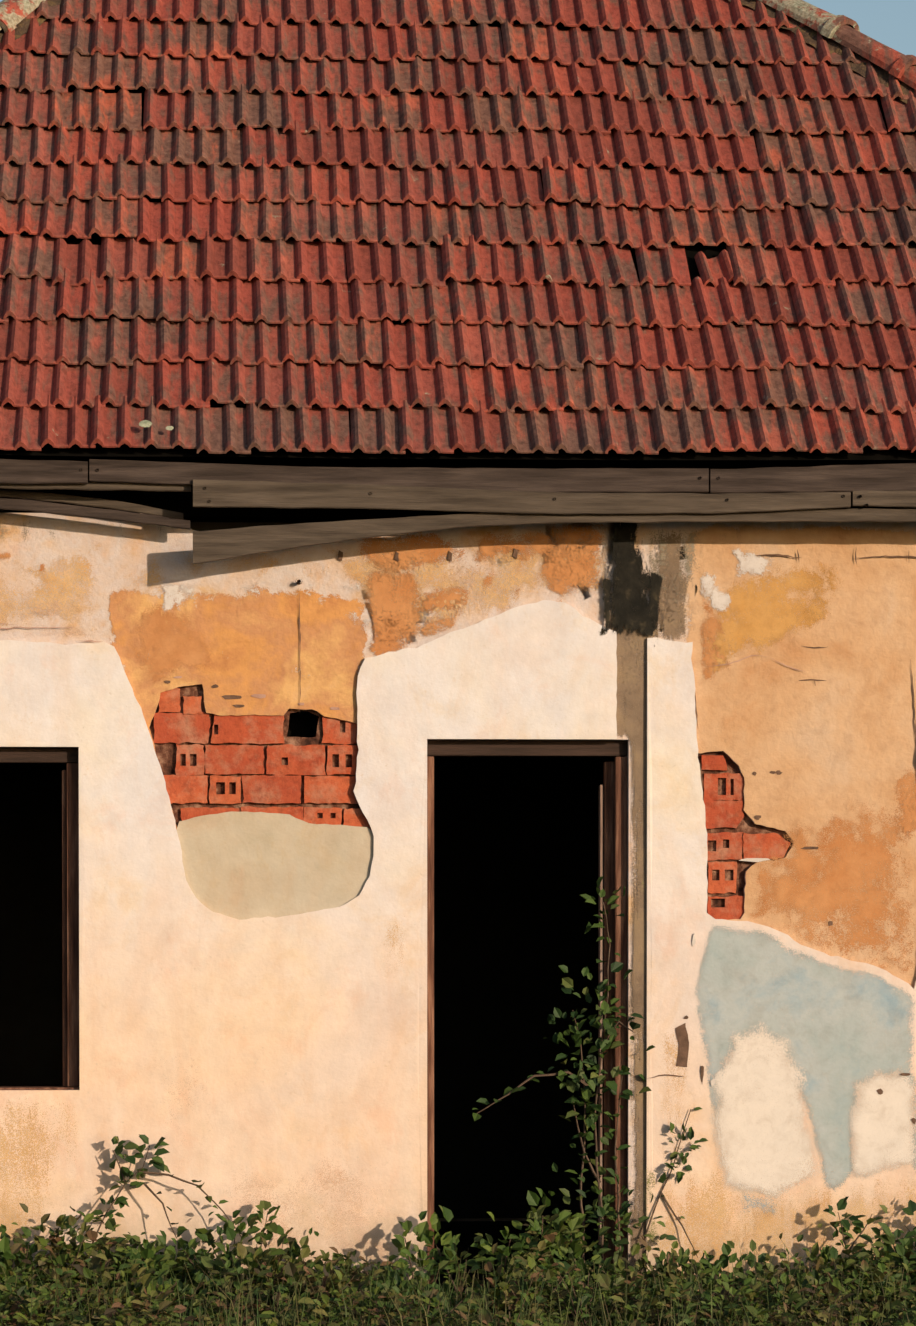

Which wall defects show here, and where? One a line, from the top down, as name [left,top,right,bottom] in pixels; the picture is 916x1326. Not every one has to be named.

spalling [694,249,742,287]
flaking render [108,523,608,920]
water stain [0,520,916,1277]
flaking render [675,522,916,1216]